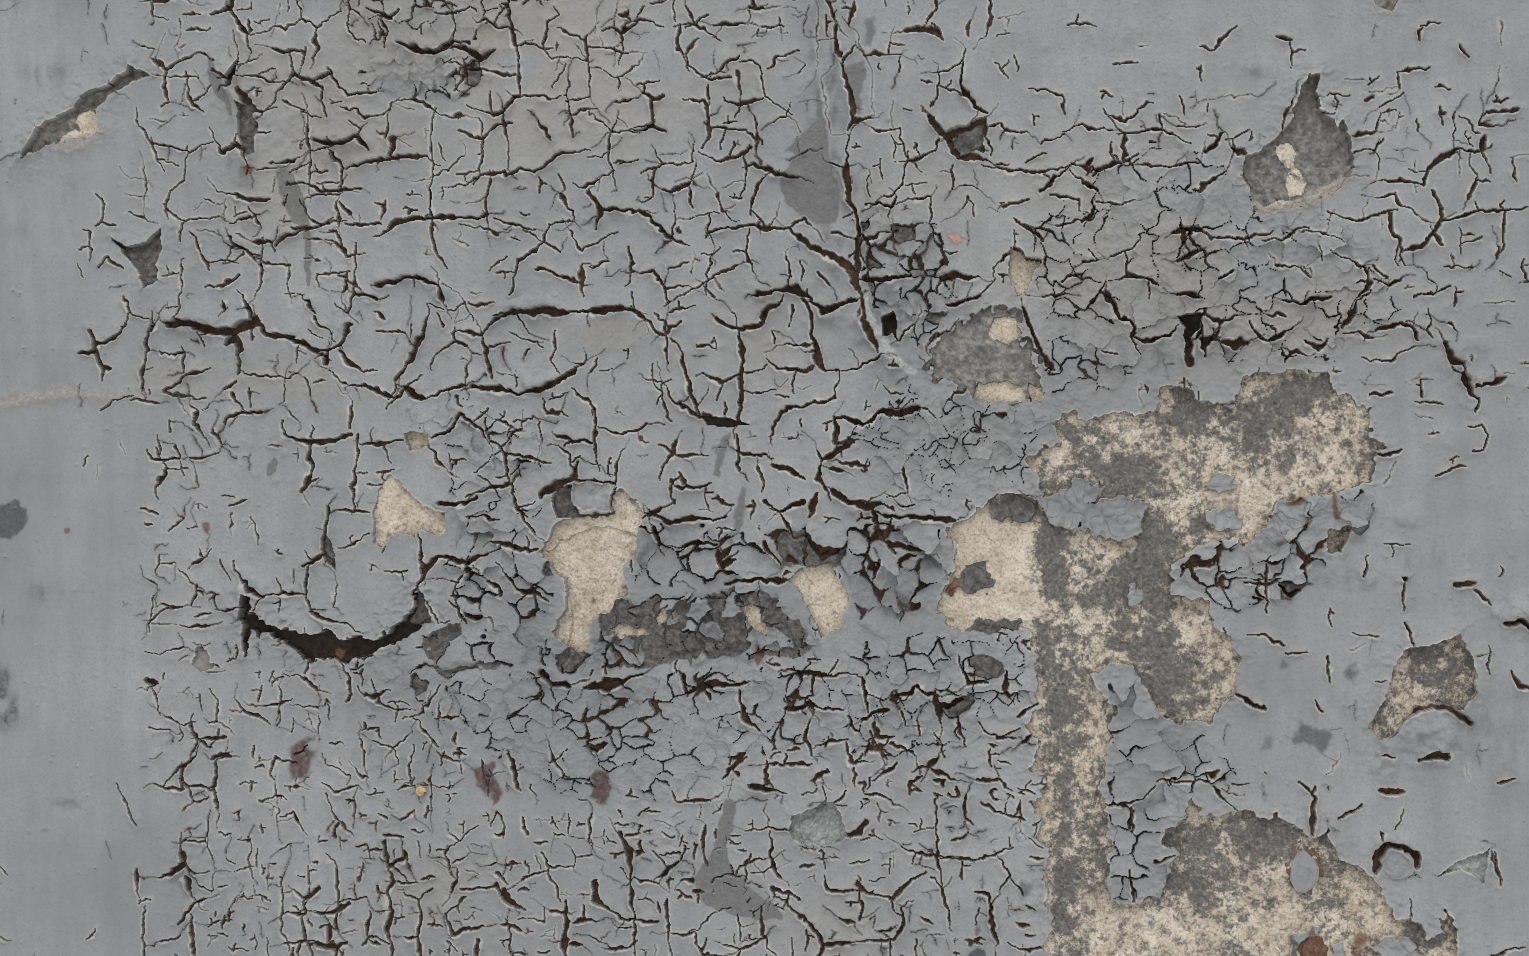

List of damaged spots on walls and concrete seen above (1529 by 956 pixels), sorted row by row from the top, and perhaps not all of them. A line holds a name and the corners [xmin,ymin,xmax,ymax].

spalling [23,67,150,158]
crack [1273,32,1311,136]
spalling [1374,0,1398,11]
crack [1416,0,1444,44]
crack [1456,42,1473,61]
crack [1007,64,1529,479]
crack [76,0,1278,956]
spalling [237,74,1458,956]
crack [1375,447,1406,487]
crack [1105,541,1529,921]
spalling [1368,634,1478,741]
crack [1489,941,1529,956]